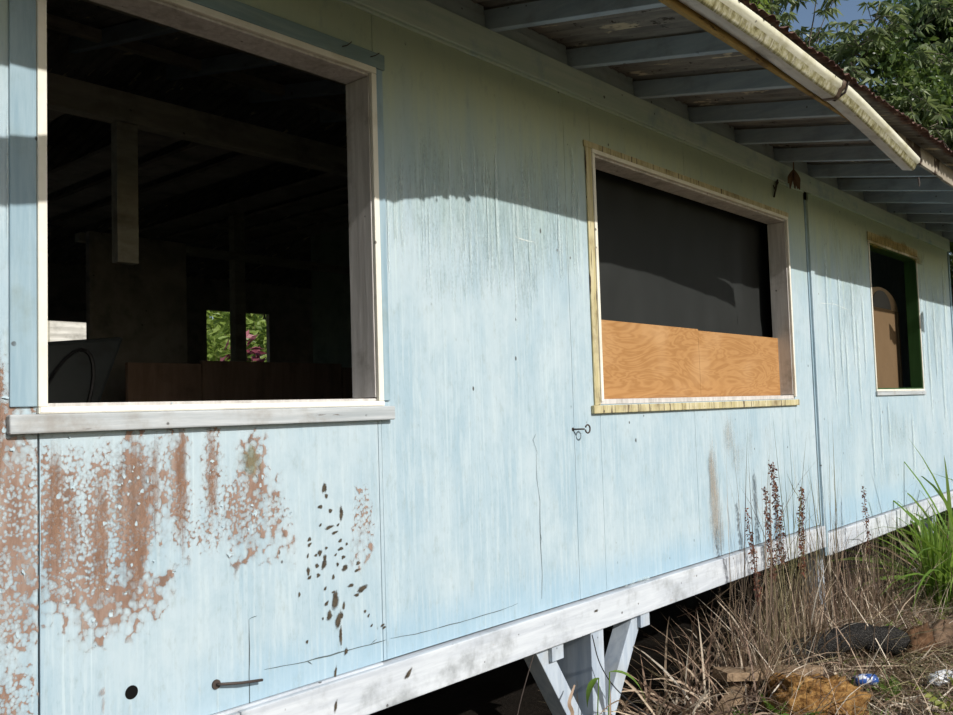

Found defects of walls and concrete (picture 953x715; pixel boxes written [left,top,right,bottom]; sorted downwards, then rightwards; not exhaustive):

peeling [0,364,295,651]
peeling [352,487,374,568]
peeling [0,663,39,715]